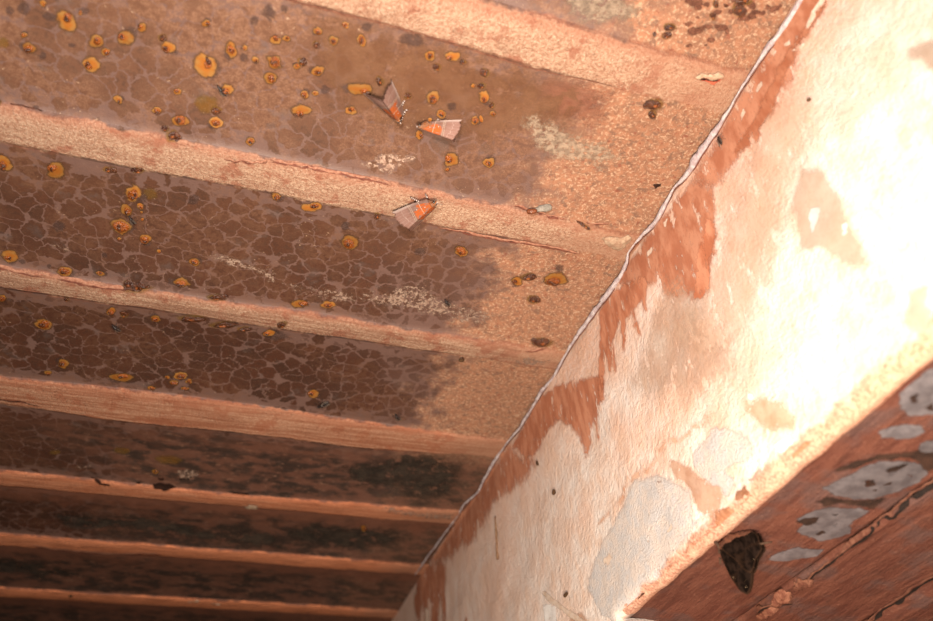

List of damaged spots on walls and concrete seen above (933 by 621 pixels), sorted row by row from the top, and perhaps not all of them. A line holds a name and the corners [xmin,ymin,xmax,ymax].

crack [288,0,629,93]
crack [224,158,390,186]
rust [110,184,161,253]
water stain [794,171,864,264]
crack [0,265,126,291]
water stain [315,284,497,323]
rust [511,272,569,286]
rust [531,338,551,347]
water stain [385,0,826,621]
peeling [878,368,933,453]
peeling [588,476,696,621]
peeling [769,461,928,561]